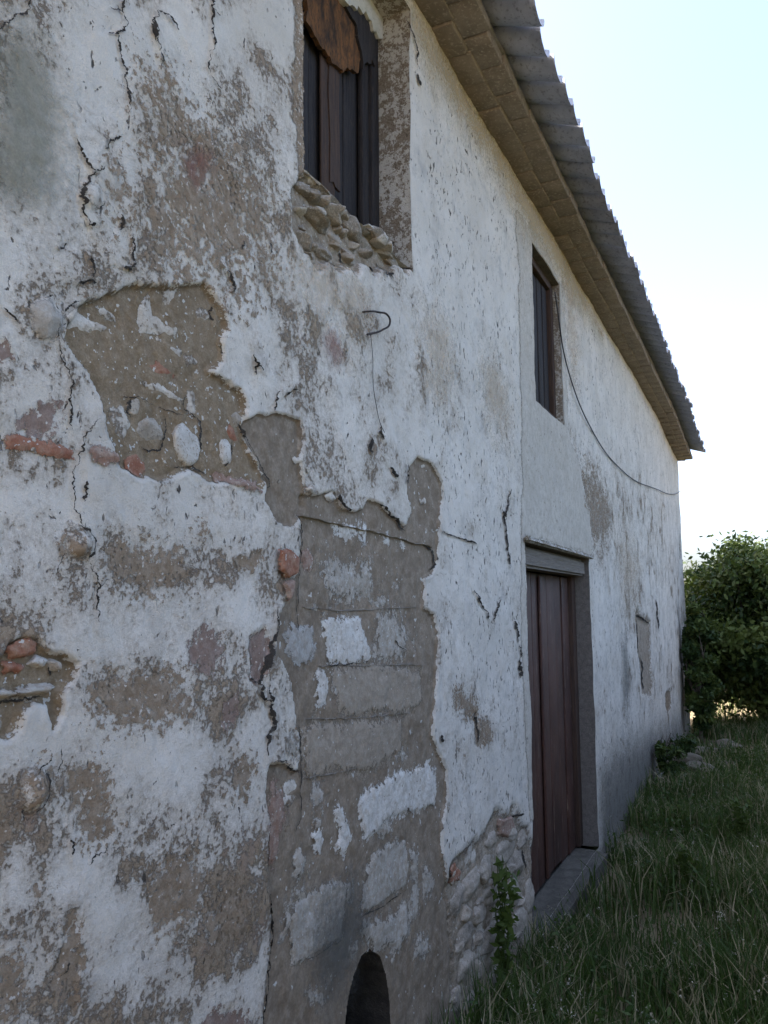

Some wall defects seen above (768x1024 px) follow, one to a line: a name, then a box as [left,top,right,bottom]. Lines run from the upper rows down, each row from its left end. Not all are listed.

crack [77,0,179,271]
spalling [64,0,410,493]
crack [60,347,98,526]
crack [90,563,108,621]
peeling [0,516,226,858]
crack [251,612,280,756]
peeling [328,516,406,552]
crack [474,590,523,678]
crack [503,489,512,568]
peeling [635,608,652,696]
peeling [291,800,352,881]
spalling [442,804,538,1024]